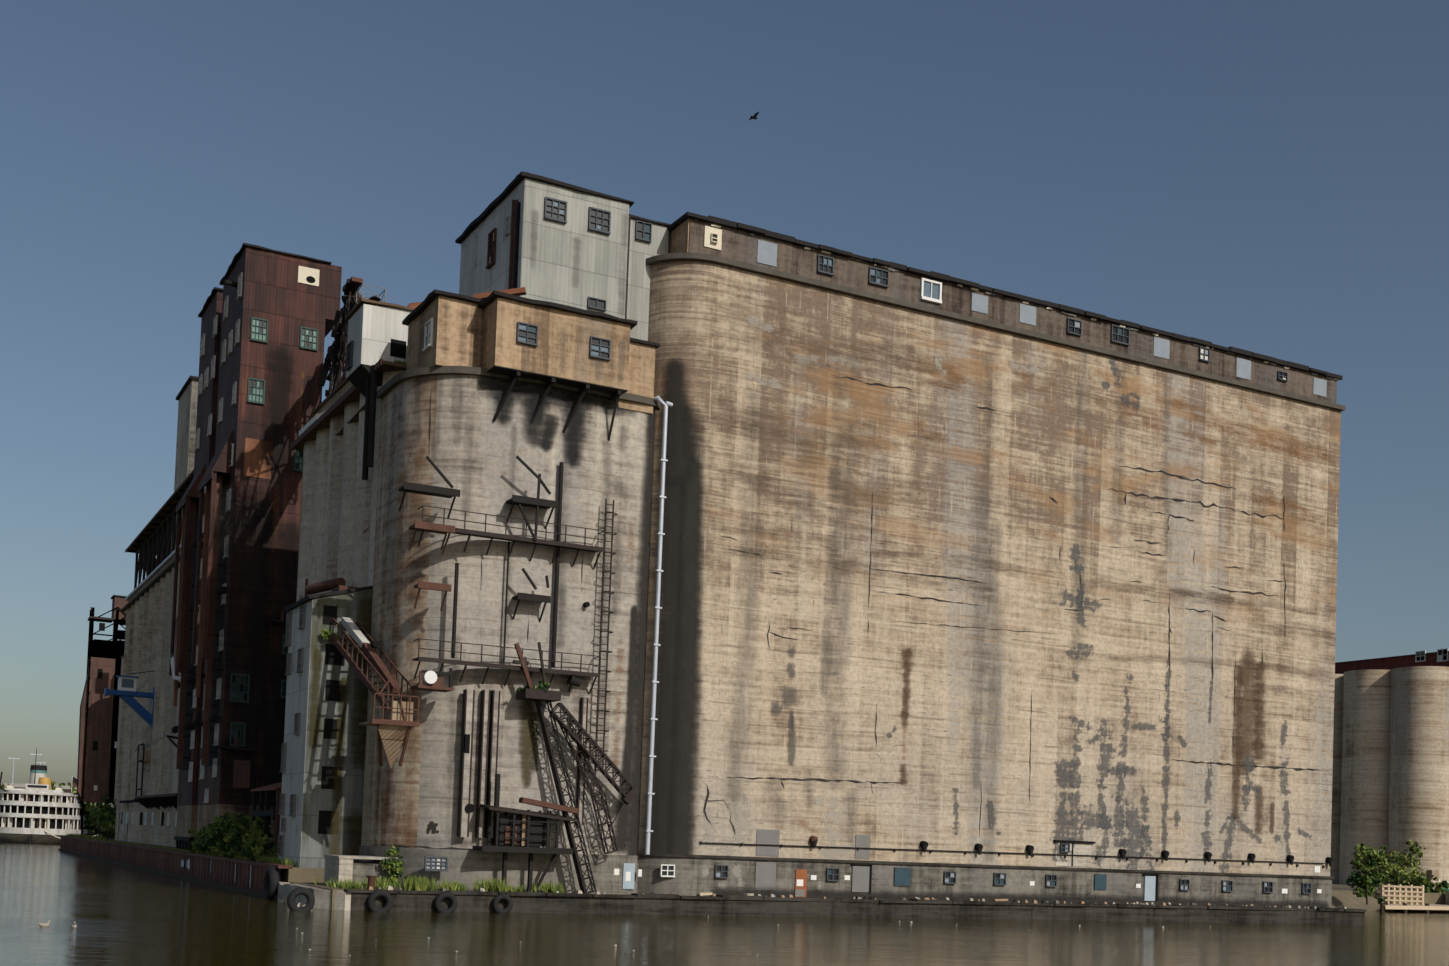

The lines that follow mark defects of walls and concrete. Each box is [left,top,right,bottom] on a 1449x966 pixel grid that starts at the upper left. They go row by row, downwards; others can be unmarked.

leakage [480,360,701,856]
crack [868,464,1321,771]